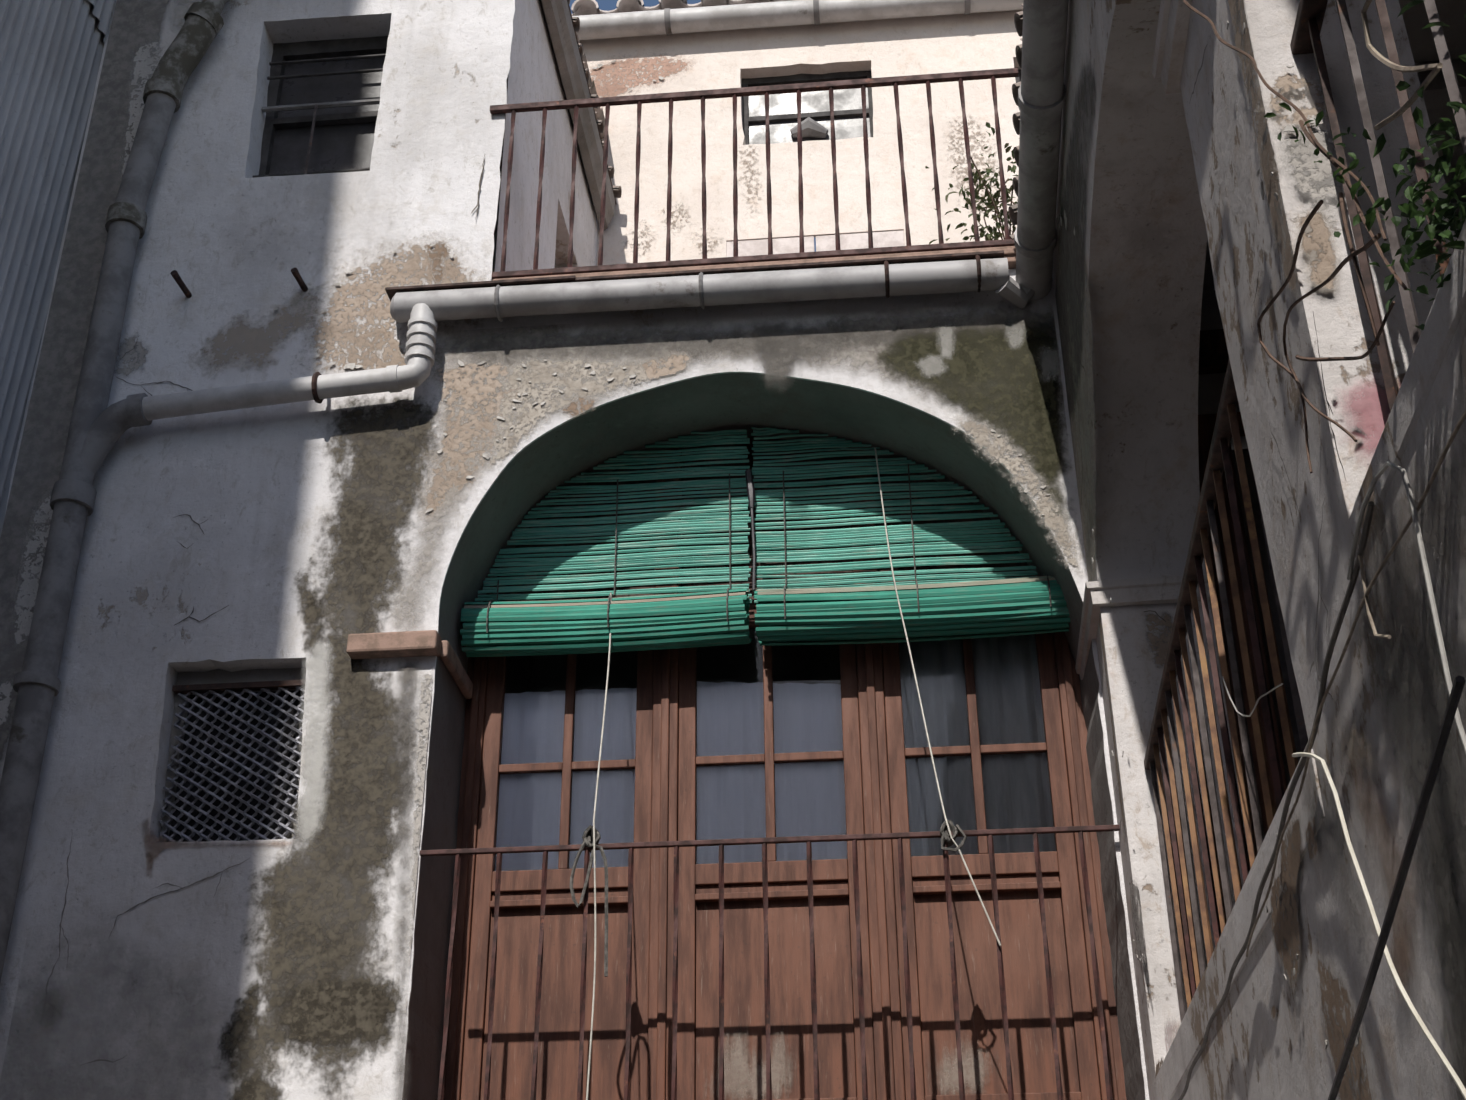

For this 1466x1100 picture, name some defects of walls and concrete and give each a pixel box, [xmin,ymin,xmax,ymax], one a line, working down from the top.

flaking render [590,55,689,98]
flaking render [200,241,474,372]
damp [514,68,1095,477]
crack [175,605,229,625]
damp [297,573,322,657]
crack [41,838,72,1024]
crack [109,859,248,937]
flaking render [1266,817,1317,981]
damp [221,983,261,1057]
damp [280,979,401,1045]
flaking render [1318,957,1372,1100]
damp [230,1074,280,1100]